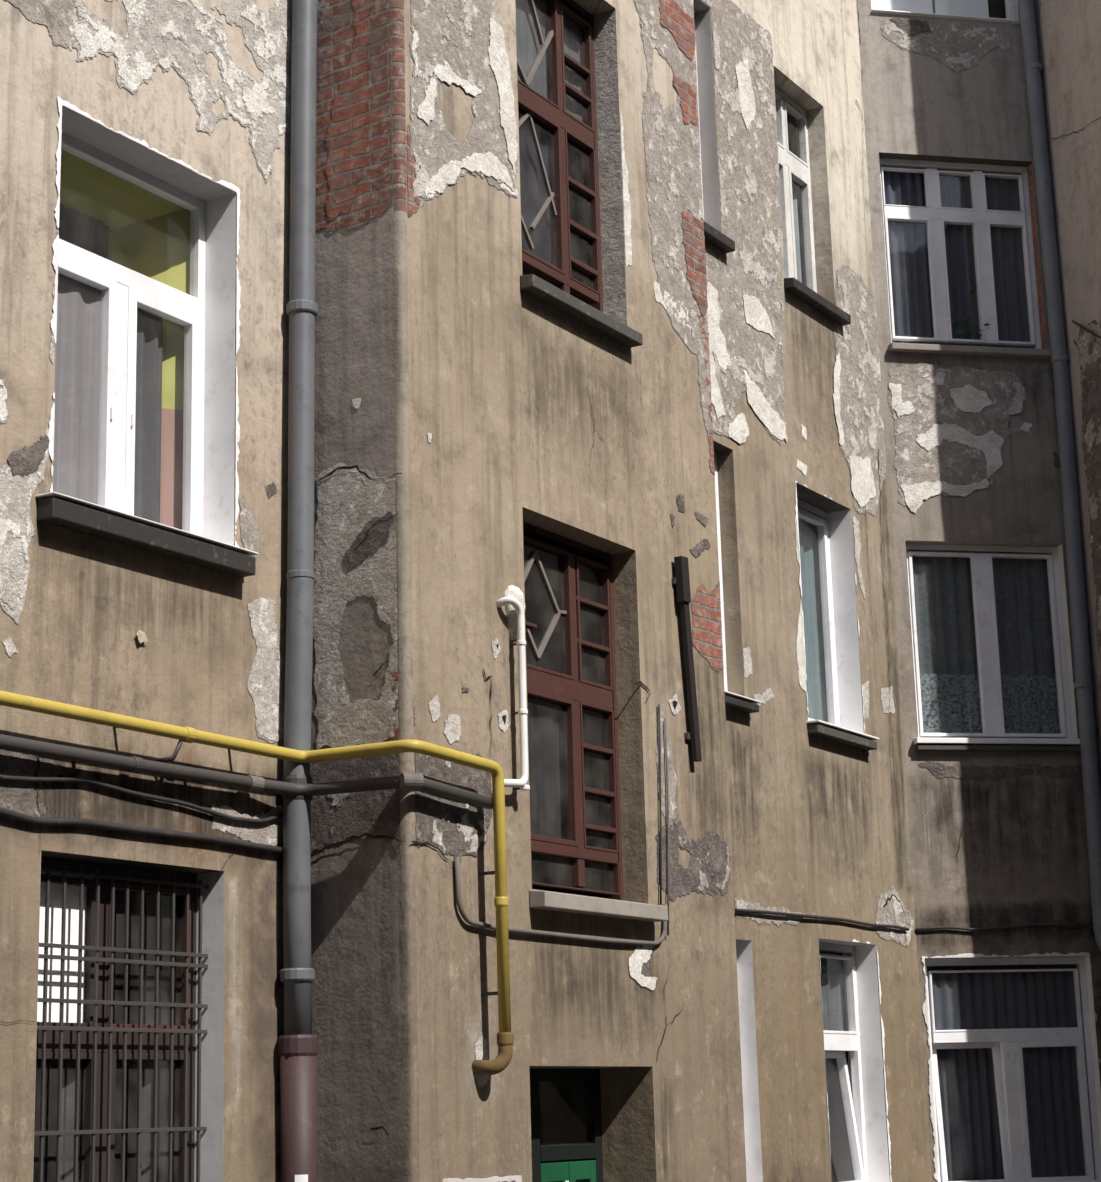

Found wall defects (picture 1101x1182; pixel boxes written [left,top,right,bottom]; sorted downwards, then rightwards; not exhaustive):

flaking render [5,0,292,184]
flaking render [316,0,392,234]
flaking render [407,0,519,217]
flaking render [620,112,632,267]
flaking render [634,0,788,475]
flaking render [0,427,50,624]
flaking render [833,265,1032,599]
flaking render [247,597,285,743]
flaking render [311,462,400,854]
flaking render [414,695,493,862]
flaking render [656,694,804,927]
damp [937,791,953,827]